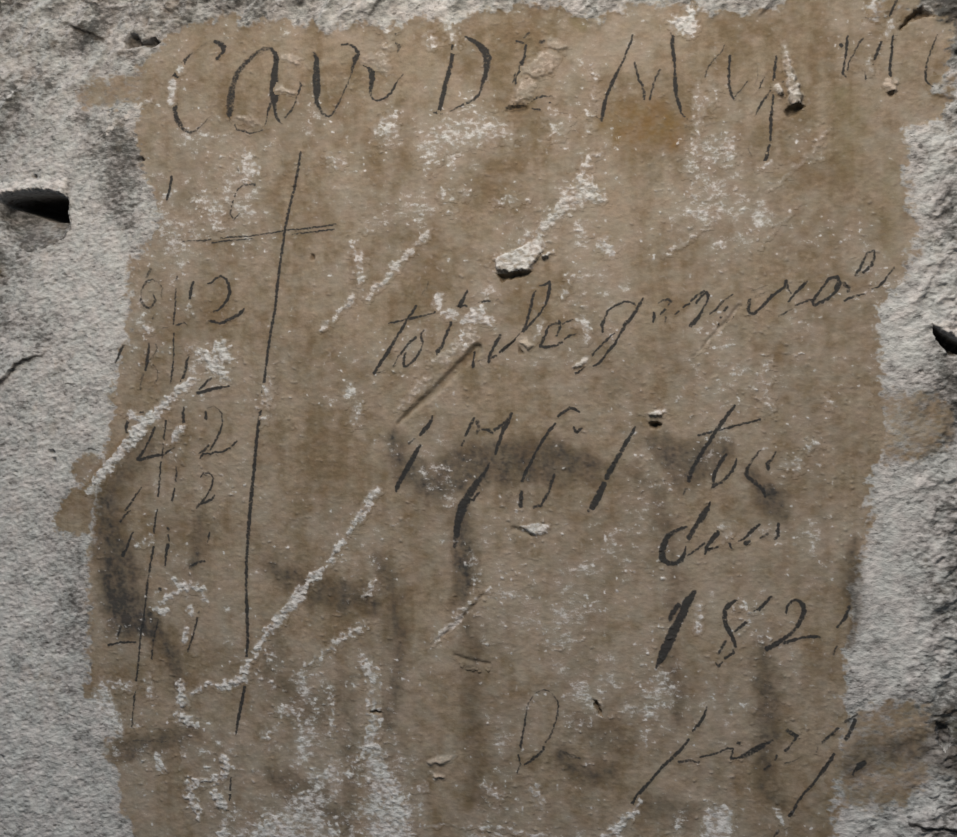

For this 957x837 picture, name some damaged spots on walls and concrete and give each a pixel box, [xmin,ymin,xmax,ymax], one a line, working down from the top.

peeling [230,52,273,131]
spalling [880,74,901,94]
peeling [158,213,199,247]
peeling [137,318,158,337]
peeling [817,280,835,301]
spalling [923,315,957,340]
crack [0,351,46,385]
damp [88,428,165,521]
spalling [83,373,202,497]
damp [88,532,191,698]
damp [255,547,394,627]
peeling [96,483,386,837]